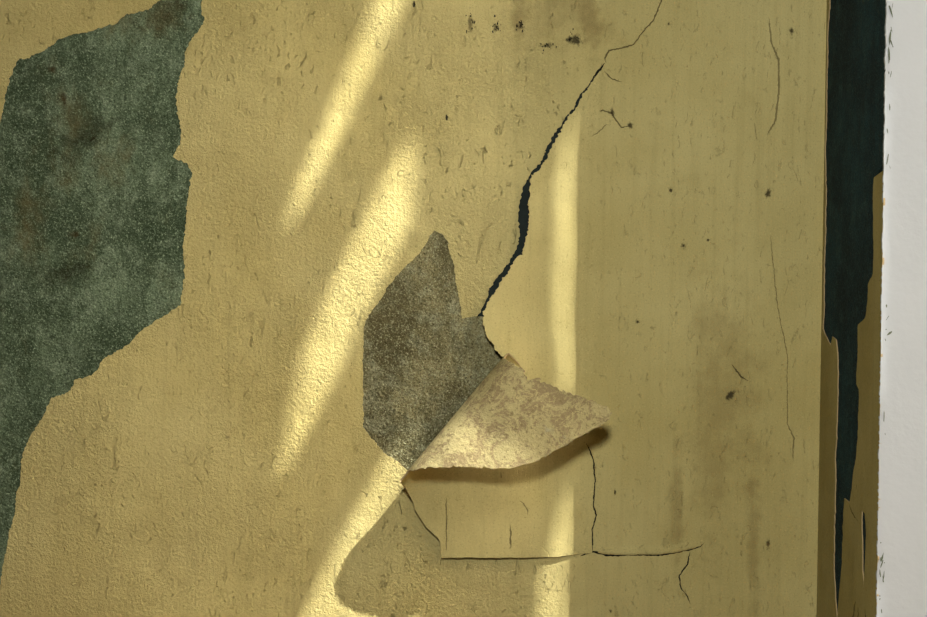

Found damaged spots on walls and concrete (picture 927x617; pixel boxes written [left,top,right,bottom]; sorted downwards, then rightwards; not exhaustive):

peeling [0,0,205,584]
peeling [362,67,612,558]
crack [477,0,662,317]
crack [581,441,704,602]
peeling [824,0,893,611]